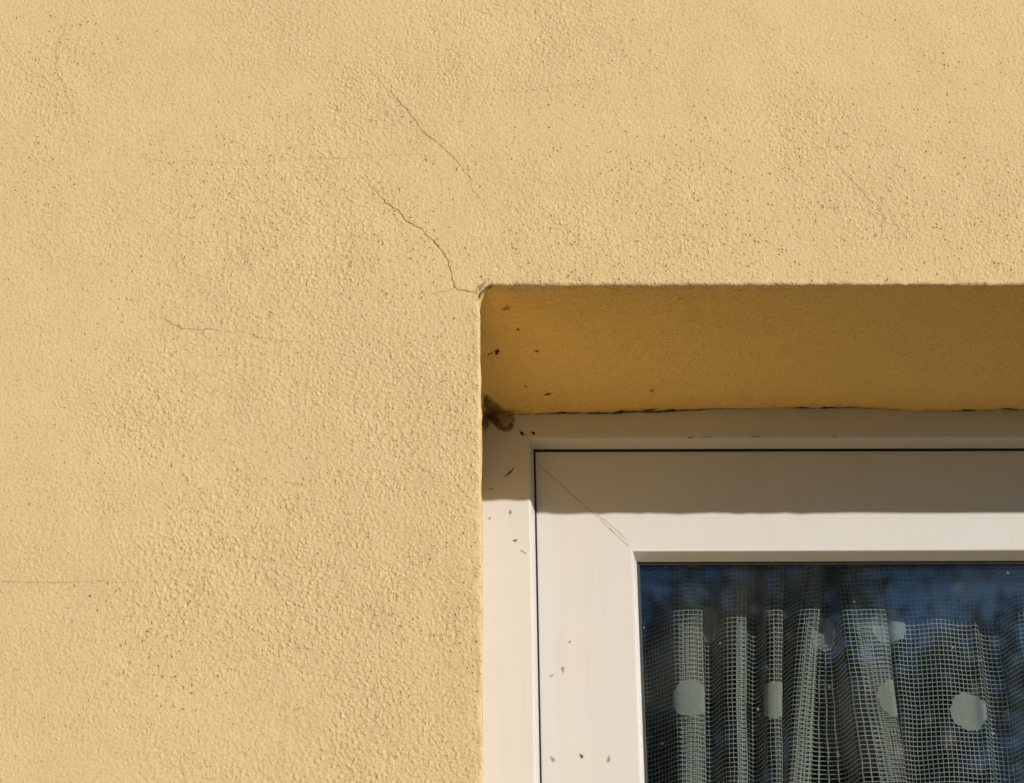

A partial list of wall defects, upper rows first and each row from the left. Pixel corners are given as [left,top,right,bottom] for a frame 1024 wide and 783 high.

crack [384,199,480,294]